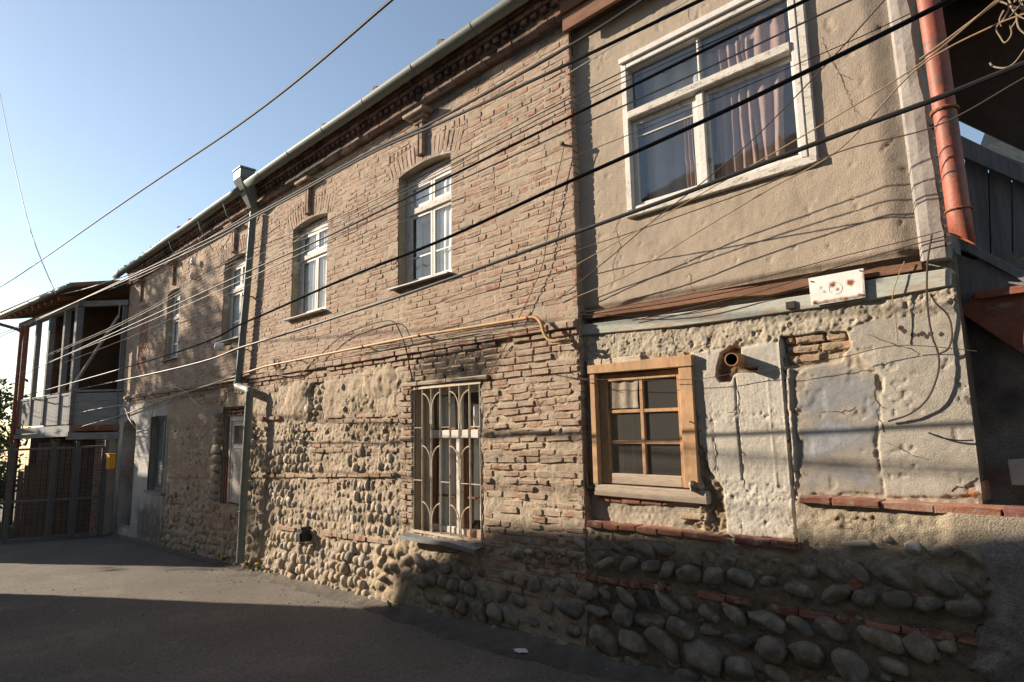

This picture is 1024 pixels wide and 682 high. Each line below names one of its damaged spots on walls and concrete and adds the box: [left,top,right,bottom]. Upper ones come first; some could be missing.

corrosion [814,273,867,304]
spalling [718,332,851,382]
crack [713,381,746,490]